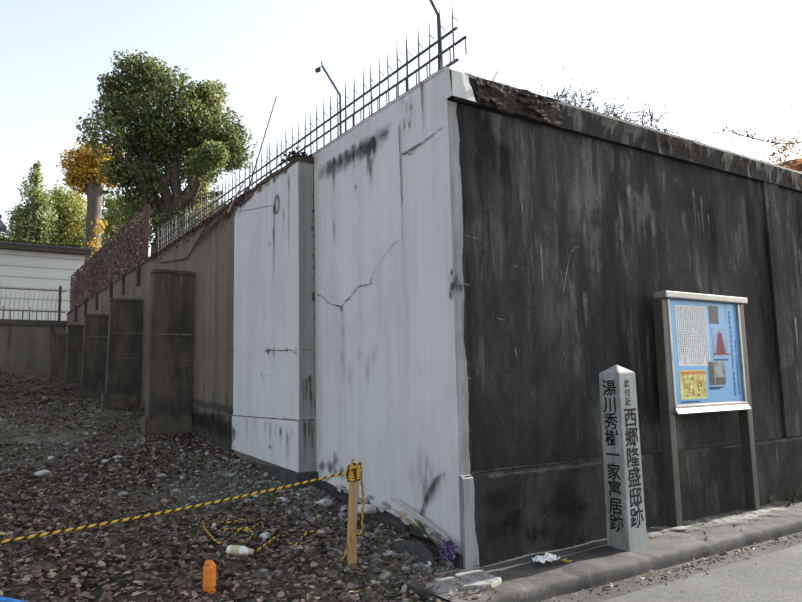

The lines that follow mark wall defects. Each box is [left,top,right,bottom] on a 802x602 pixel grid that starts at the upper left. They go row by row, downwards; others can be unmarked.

damp [327,132,386,176]
crack [317,127,442,310]
damp [619,186,654,245]
damp [164,399,234,448]